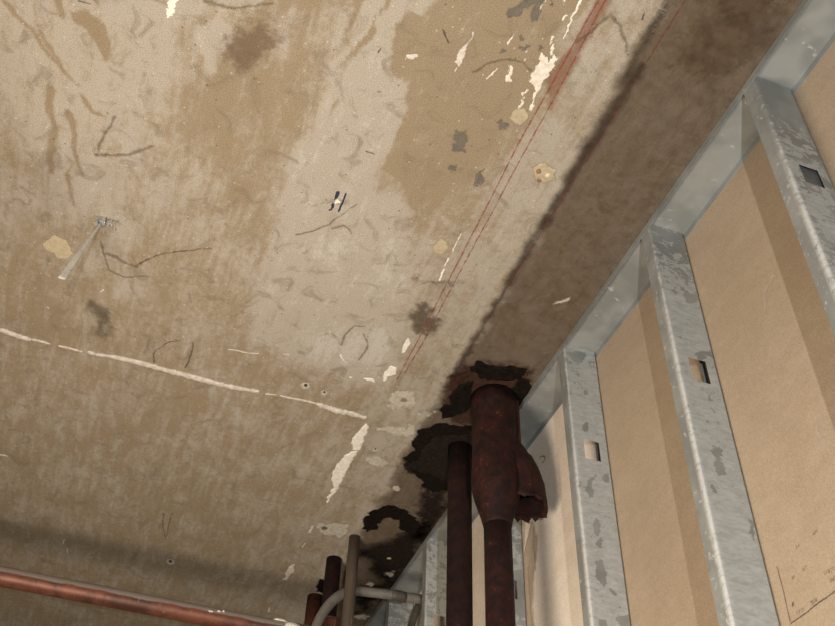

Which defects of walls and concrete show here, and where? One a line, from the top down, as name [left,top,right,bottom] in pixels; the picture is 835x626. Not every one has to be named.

leakage [507,0,553,21]
leakage [452,130,468,153]
peeling [326,423,369,503]
leakage [403,360,533,493]